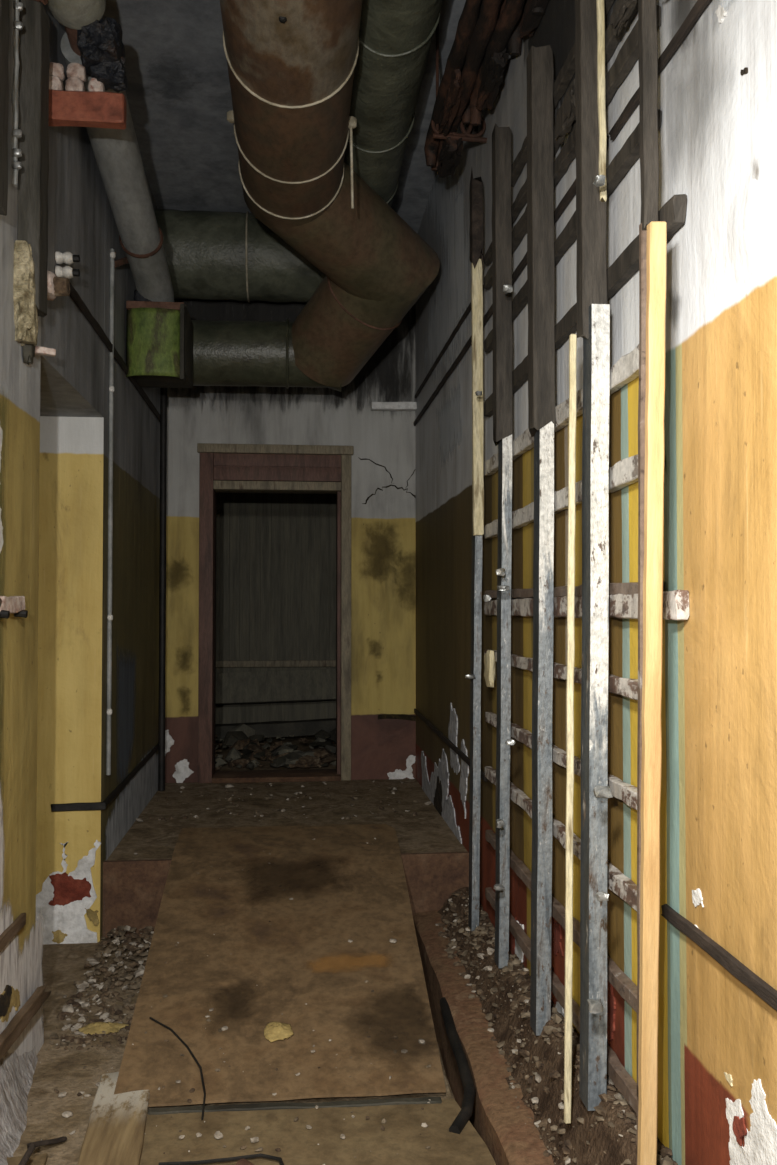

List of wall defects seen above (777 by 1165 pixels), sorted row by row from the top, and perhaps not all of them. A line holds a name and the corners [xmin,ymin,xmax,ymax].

crack [358,457,416,504]
peeling [165,730,194,783]
peeling [387,703,469,844]
peeling [36,840,101,944]
spalling [0,985,20,1022]
peeling [724,1072,777,1165]